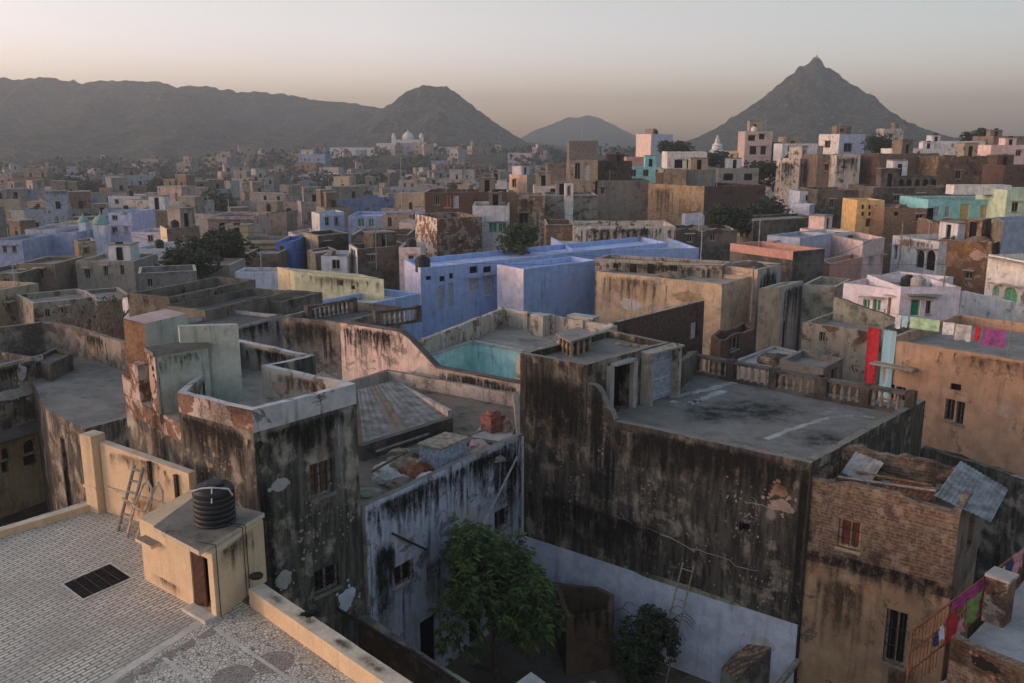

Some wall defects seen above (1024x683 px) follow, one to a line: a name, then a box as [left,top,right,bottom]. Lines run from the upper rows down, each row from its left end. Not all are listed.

leakage [183,409,354,487]
peeling [267,477,290,492]
peeling [275,452,354,591]
peeling [336,579,361,614]
leakage [368,374,952,622]
peeling [725,474,797,609]